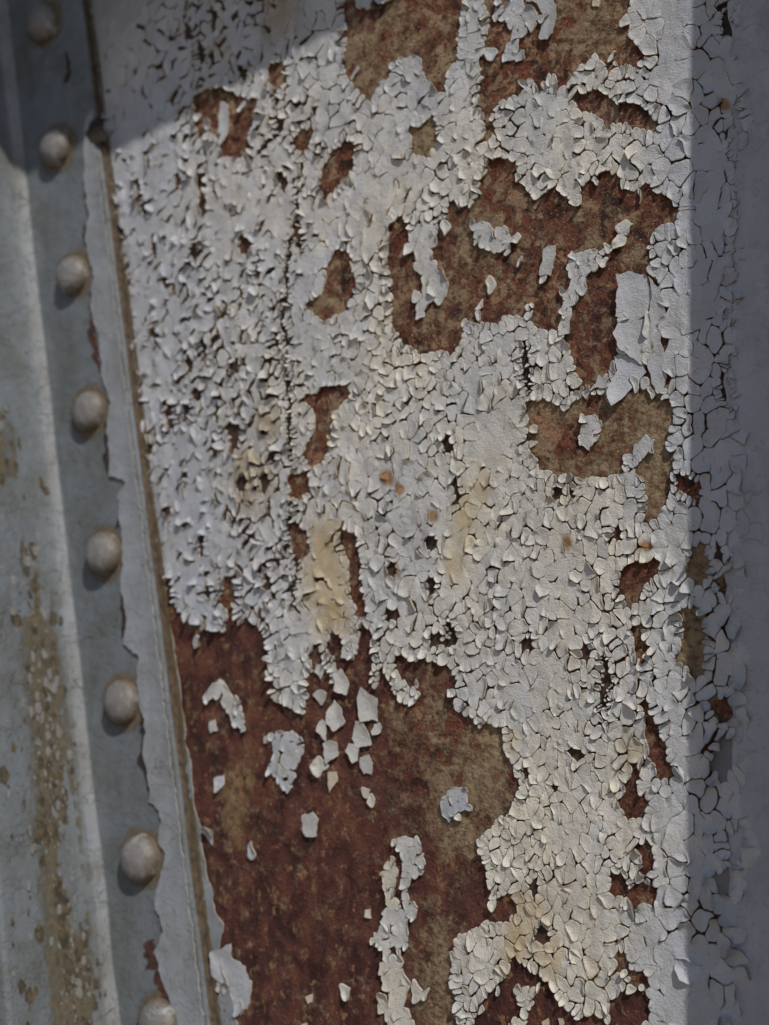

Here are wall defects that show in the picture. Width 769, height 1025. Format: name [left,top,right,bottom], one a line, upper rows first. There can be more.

rust [343,0,647,142]
crack [271,191,309,465]
peeling [89,0,658,714]
crack [521,345,535,396]
rust [387,158,703,525]
crack [283,502,301,614]
rust [89,0,521,1025]
peeling [345,0,761,1025]
crack [596,652,620,712]
peeling [309,756,329,778]
peeling [339,983,351,1002]
rust [474,946,651,1025]